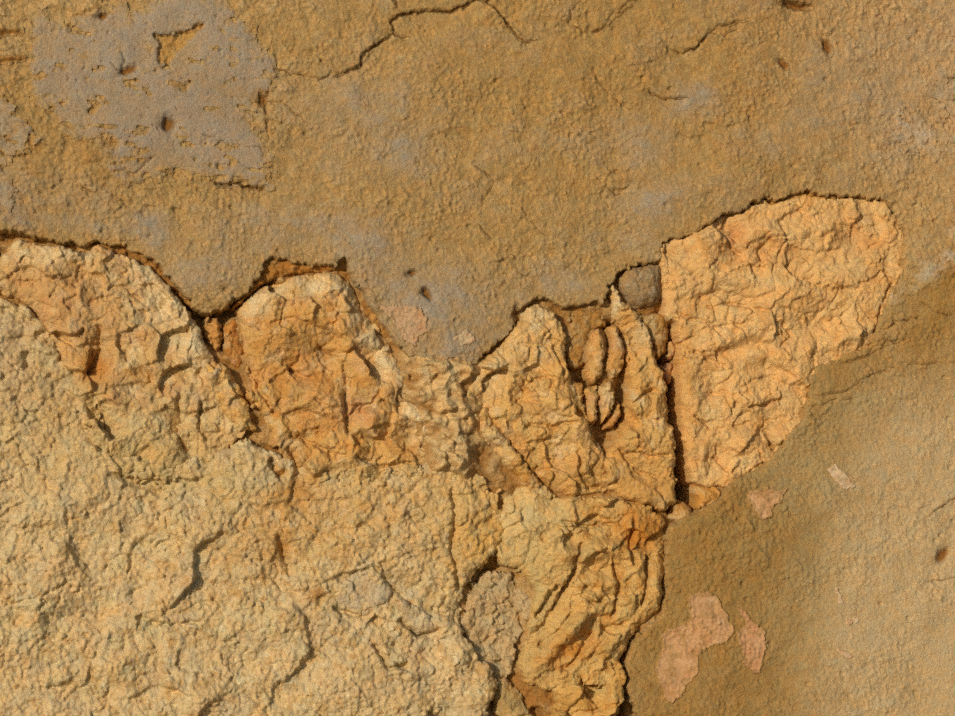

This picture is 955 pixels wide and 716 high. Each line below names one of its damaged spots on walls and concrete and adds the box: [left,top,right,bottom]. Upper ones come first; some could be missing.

crack [570,0,638,34]
crack [673,21,746,53]
spalling [768,191,837,205]
spalling [96,242,192,312]
spalling [227,258,336,313]
peeling [736,608,767,674]